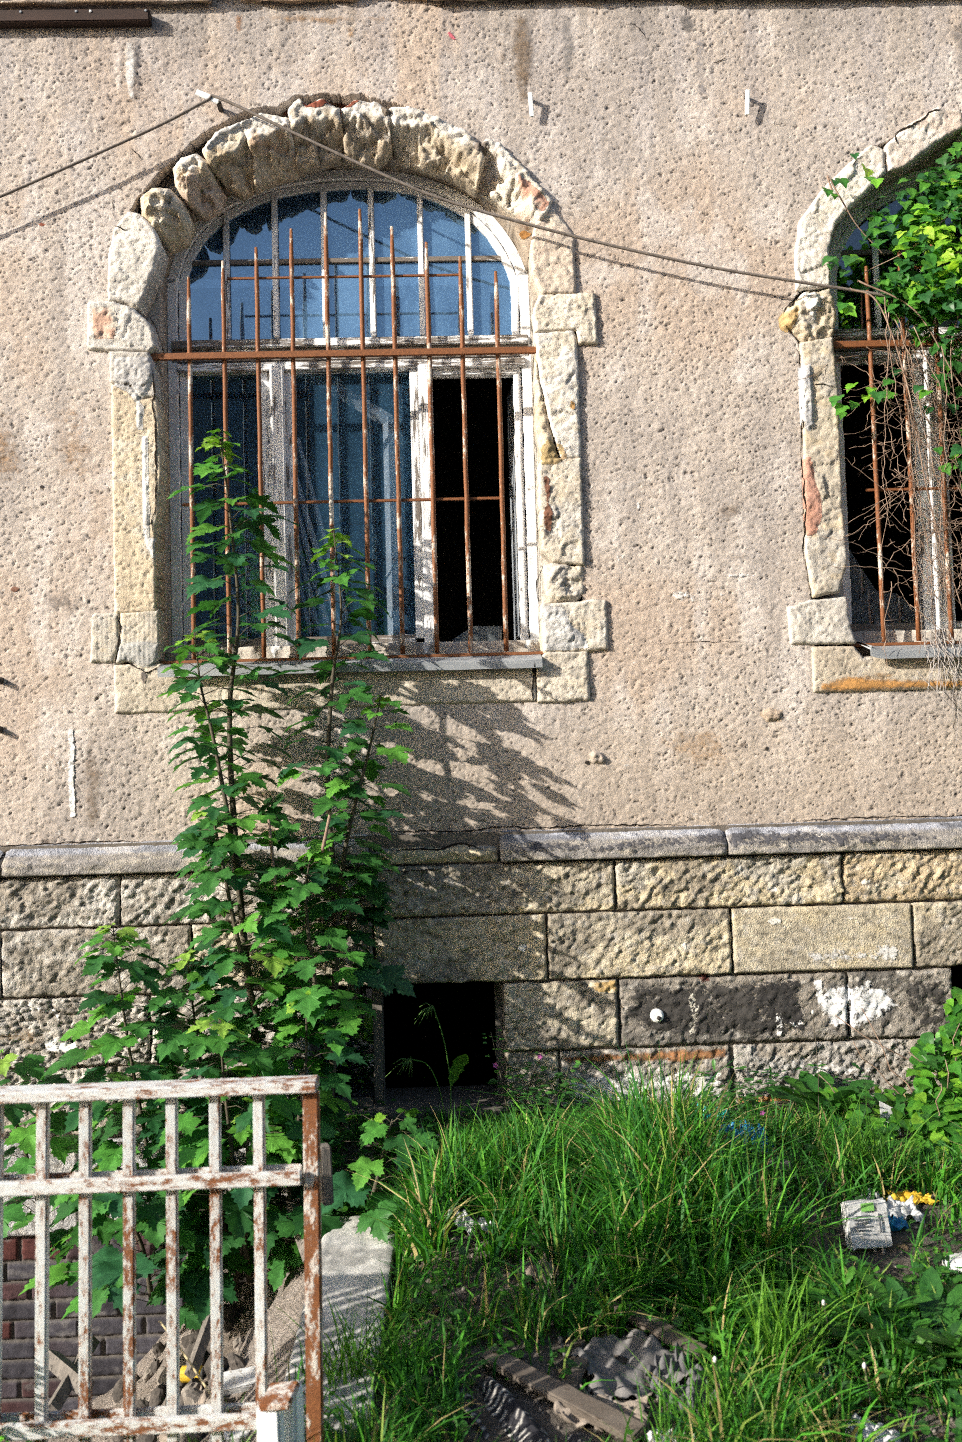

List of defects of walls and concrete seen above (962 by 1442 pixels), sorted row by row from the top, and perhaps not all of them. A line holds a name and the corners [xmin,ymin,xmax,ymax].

spalling [801,457,829,536]
corrosion [821,674,962,691]
leakage [808,945,900,962]
leakage [689,993,699,1034]
leakage [814,980,898,1030]